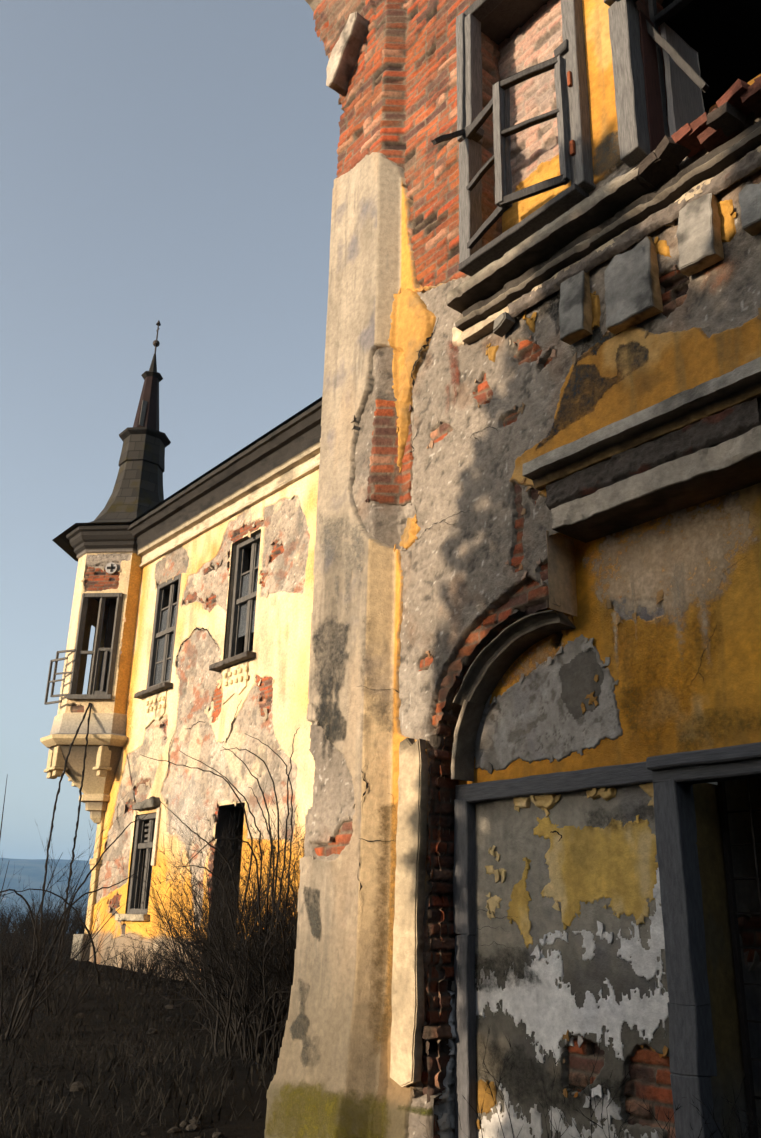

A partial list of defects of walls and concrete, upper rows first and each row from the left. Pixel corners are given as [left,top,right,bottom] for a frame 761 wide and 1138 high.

flaking render [81,553,132,592]
flaking render [313,0,761,1138]
water stain [312,621,348,753]
flaking render [96,628,355,935]
water stain [303,887,321,940]